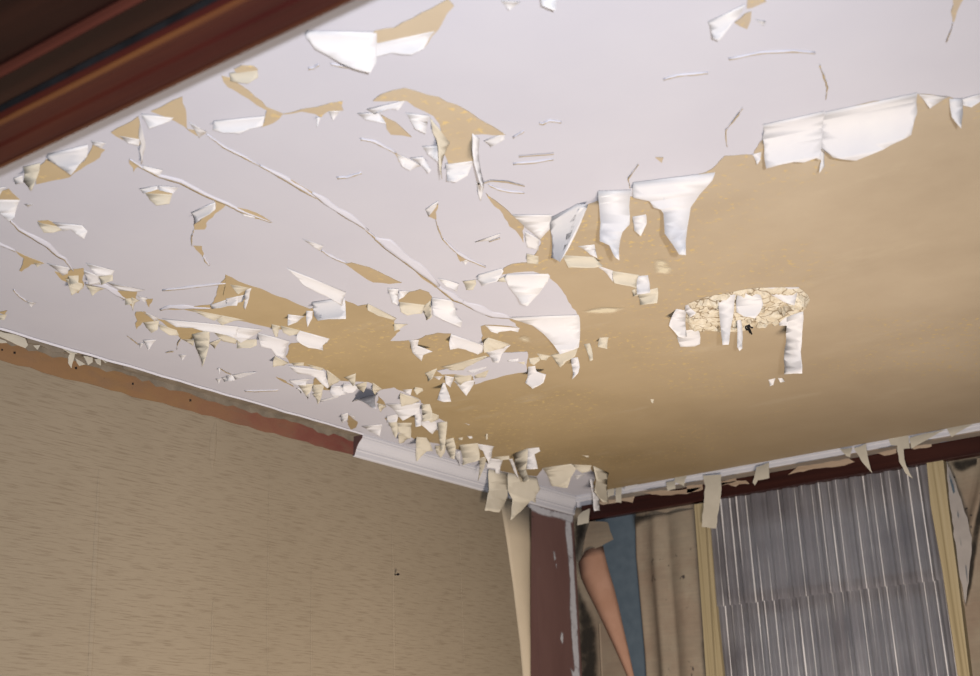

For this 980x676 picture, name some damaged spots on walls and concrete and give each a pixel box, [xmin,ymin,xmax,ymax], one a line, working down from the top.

peeling [111,65,343,164]
peeling [14,141,106,191]
peeling [0,186,153,309]
peeling [0,310,40,350]
peeling [64,349,101,368]
peeling [135,88,980,676]